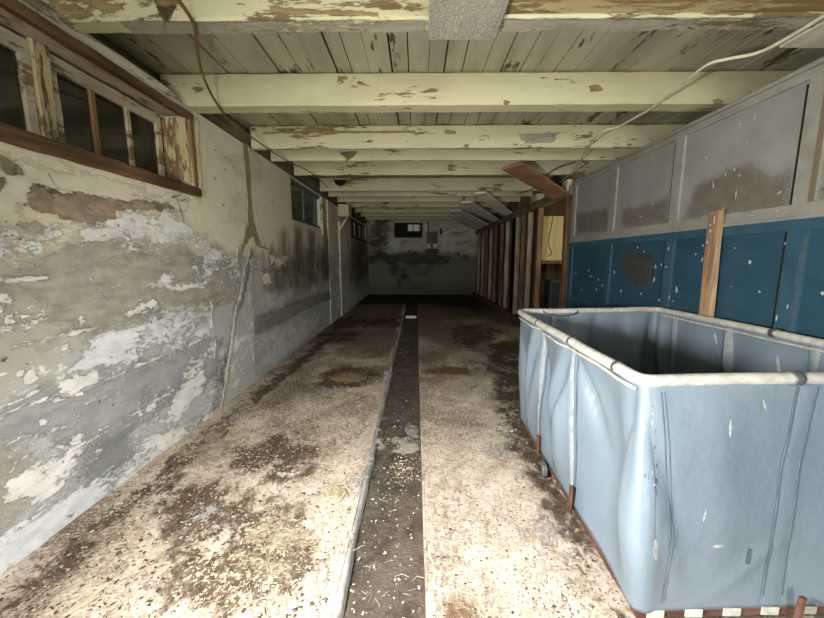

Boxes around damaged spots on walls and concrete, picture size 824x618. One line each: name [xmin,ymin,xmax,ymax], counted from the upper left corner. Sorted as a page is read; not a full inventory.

peeling [43,0,426,34]
peeling [501,16,824,32]
spalling [0,156,23,191]
peeling [520,133,559,143]
peeling [0,183,244,456]
crack [212,143,270,413]
water stain [252,222,338,338]
water stain [348,220,499,313]
water stain [353,418,420,496]
water stain [417,323,608,581]